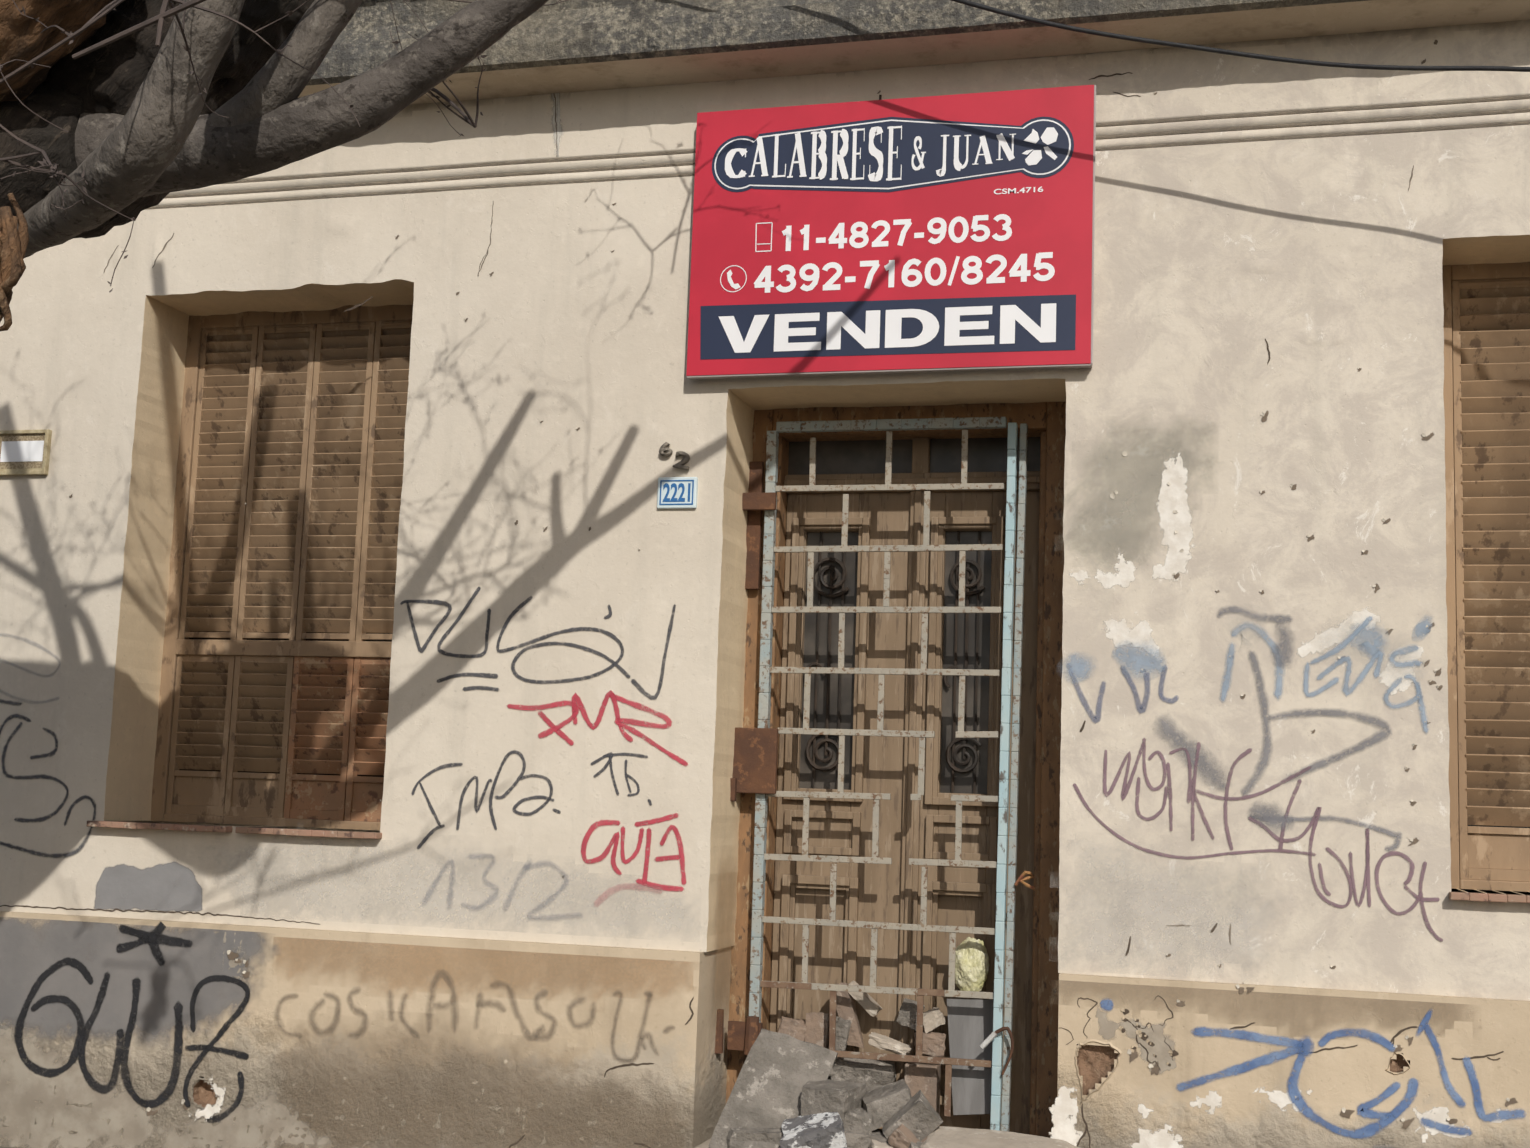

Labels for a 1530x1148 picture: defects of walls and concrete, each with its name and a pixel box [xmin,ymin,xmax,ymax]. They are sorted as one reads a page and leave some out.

peeling [1069,451,1195,589]
peeling [1103,618,1162,673]
peeling [0,1023,329,1148]
spalling [1048,1008,1183,1148]
peeling [1190,1090,1222,1114]
peeling [1253,1087,1313,1112]
spalling [1386,1035,1413,1075]
peeling [1400,1107,1469,1143]